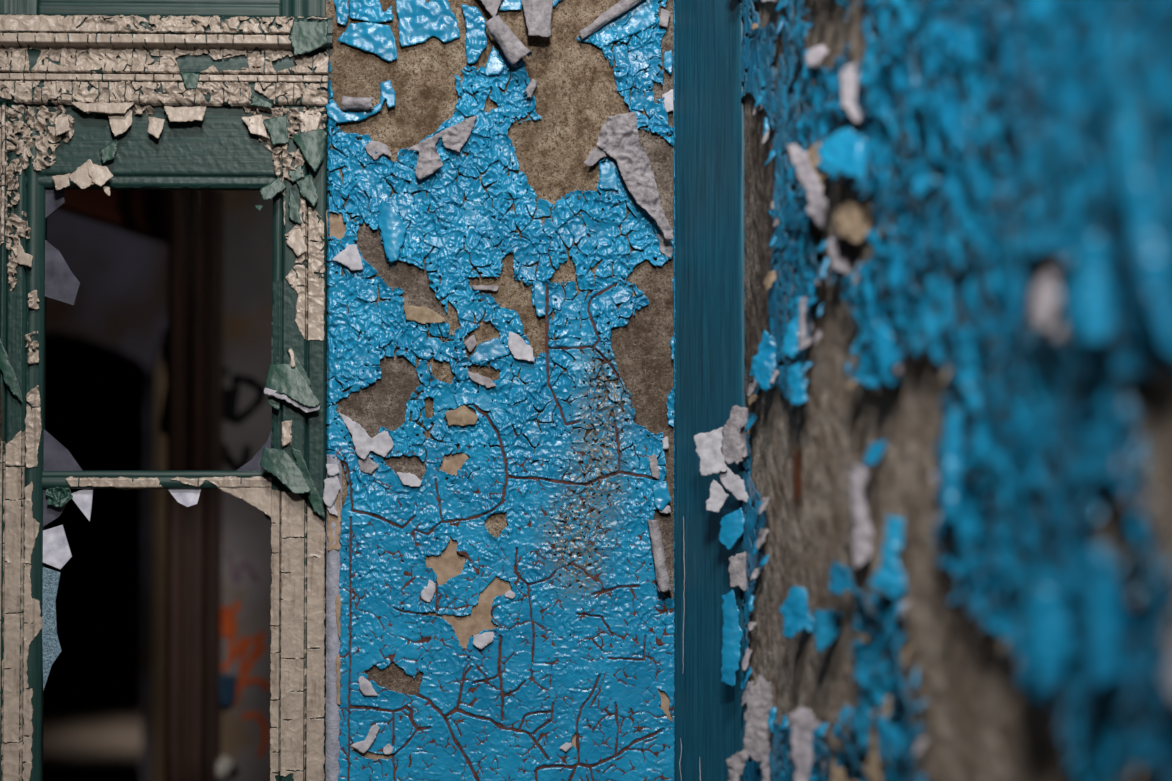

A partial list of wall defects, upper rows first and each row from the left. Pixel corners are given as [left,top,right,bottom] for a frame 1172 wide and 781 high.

peeling [0,238,33,443]
peeling [43,0,674,781]
crack [340,405,663,781]
crack [545,283,620,425]
peeling [694,0,1082,781]
peeling [1081,362,1172,609]